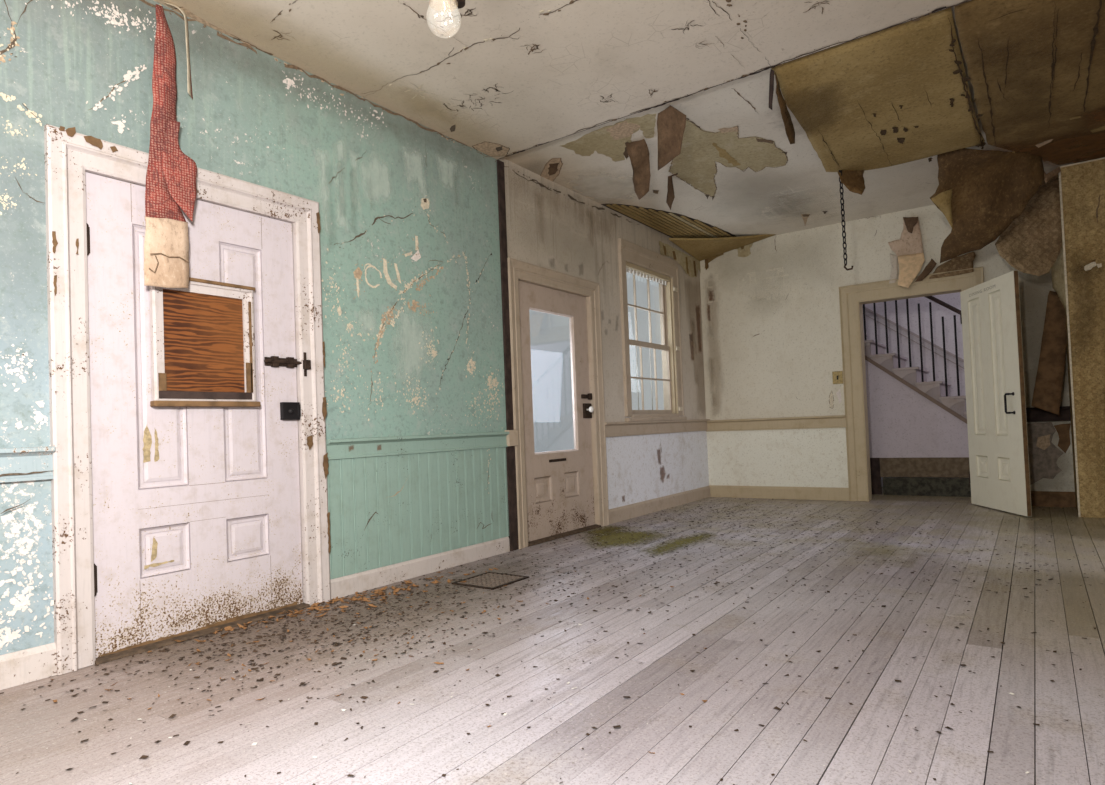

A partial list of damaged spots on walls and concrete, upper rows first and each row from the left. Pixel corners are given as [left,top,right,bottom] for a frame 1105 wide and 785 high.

crack [0,0,32,64]
peeling [50,0,156,41]
crack [0,92,42,126]
crack [86,65,147,111]
crack [140,0,971,225]
peeling [540,114,656,181]
peeling [668,119,788,199]
peeling [0,337,37,392]
peeling [321,248,439,421]
crack [323,206,492,404]
peeling [3,400,48,433]
peeling [0,513,54,652]